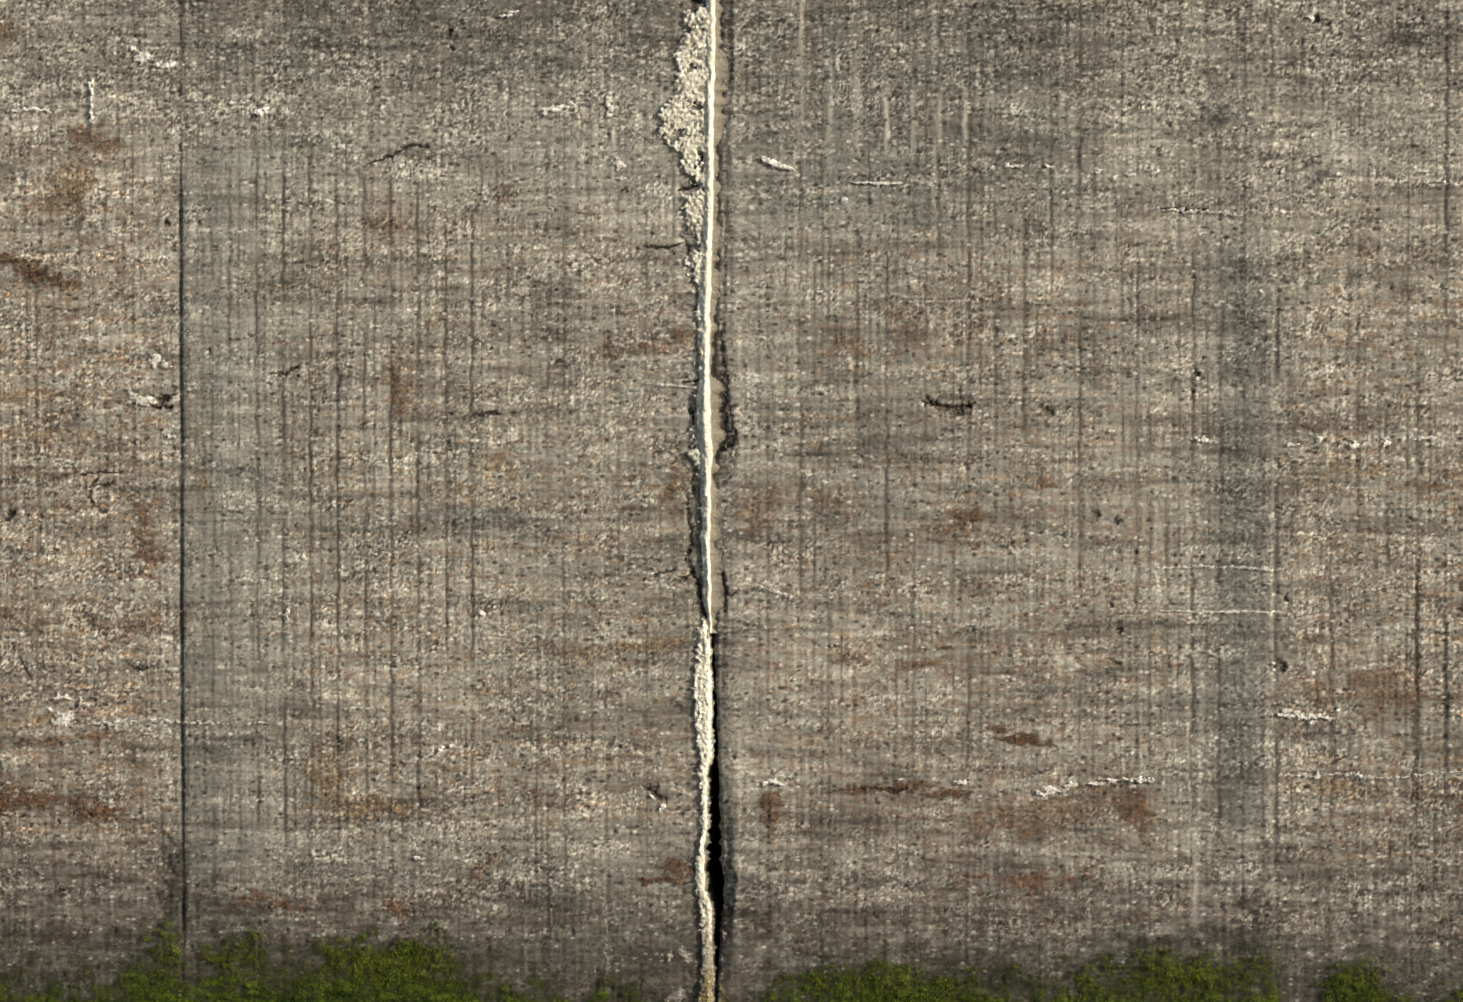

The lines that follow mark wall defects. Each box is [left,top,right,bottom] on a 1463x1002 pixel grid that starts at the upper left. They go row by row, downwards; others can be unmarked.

crack [678,150,704,191]
rust [0,253,82,289]
crack [642,237,694,282]
crack [688,318,739,465]
crack [653,478,736,620]
damp [1277,559,1463,821]
rust [0,783,129,836]
damp [667,968,729,1002]